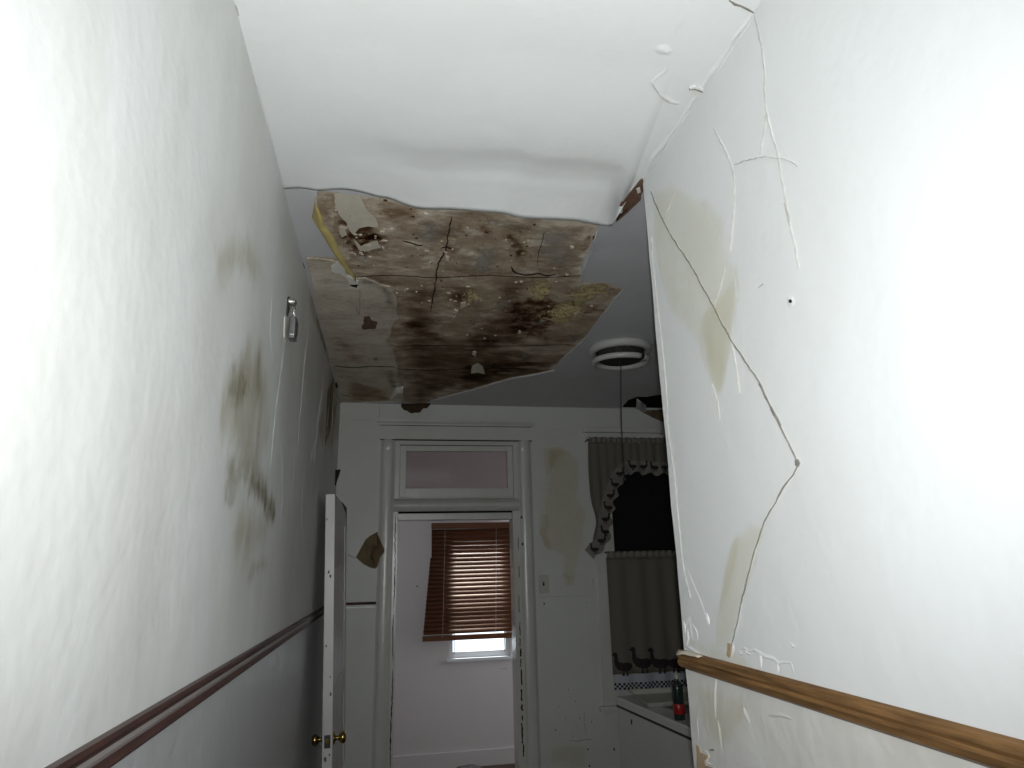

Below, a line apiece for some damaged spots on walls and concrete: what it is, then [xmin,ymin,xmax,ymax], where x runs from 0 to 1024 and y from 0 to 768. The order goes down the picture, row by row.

flaking render [306,257,409,403]
spalling [466,351,525,374]
crack [650,15,799,661]
spalling [349,516,396,597]